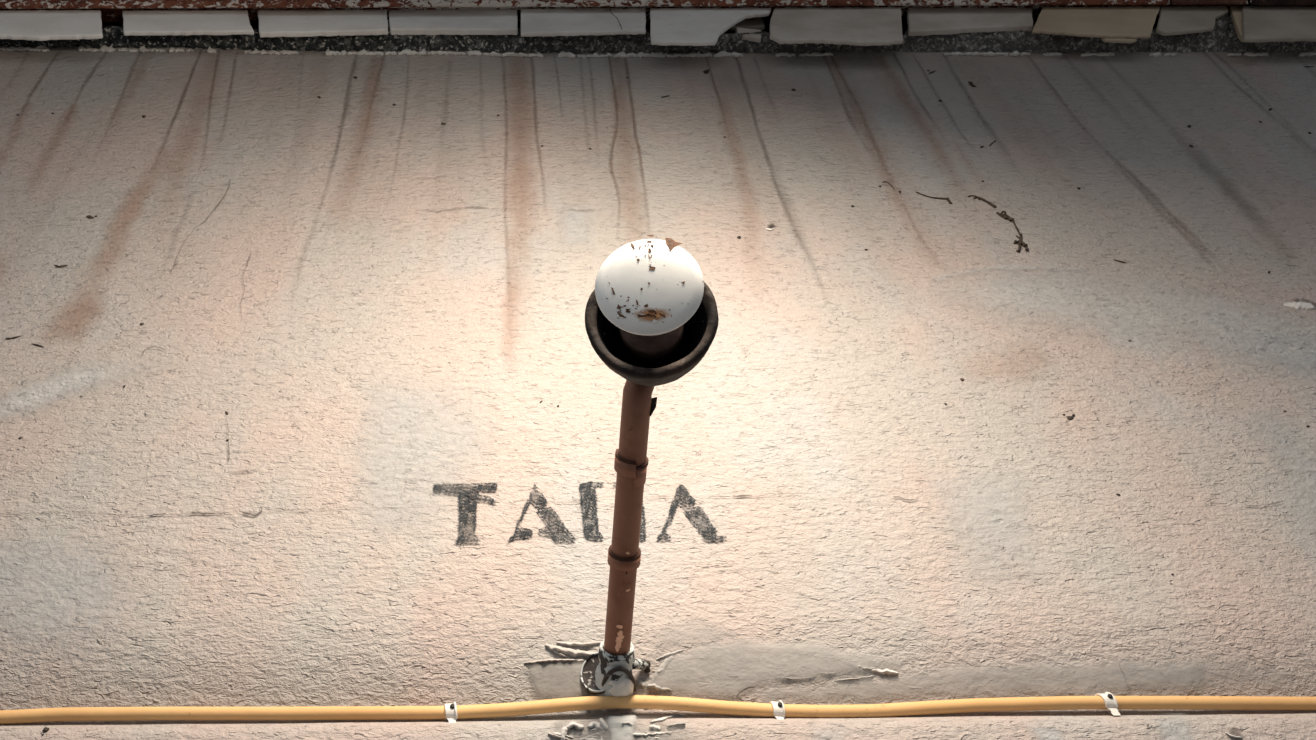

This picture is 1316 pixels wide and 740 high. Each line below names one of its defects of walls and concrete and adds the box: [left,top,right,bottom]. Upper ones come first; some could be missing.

damp [0,368,110,413]
spalling [548,709,686,740]